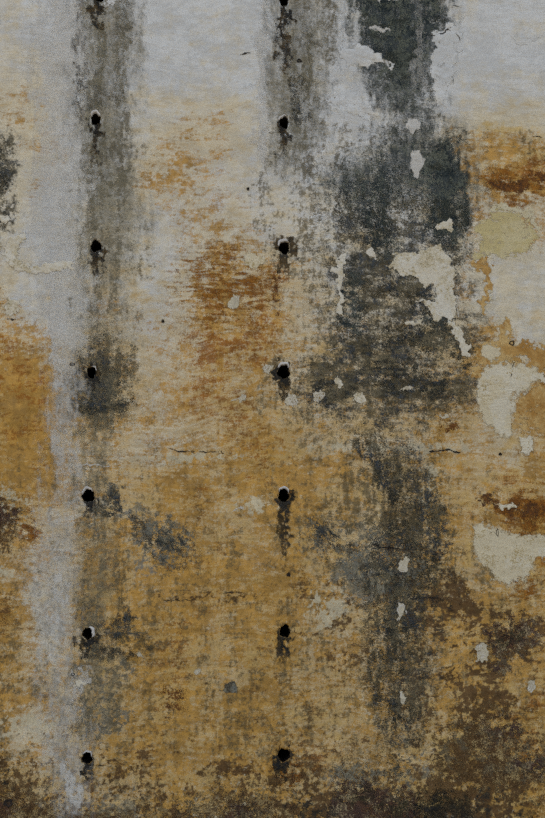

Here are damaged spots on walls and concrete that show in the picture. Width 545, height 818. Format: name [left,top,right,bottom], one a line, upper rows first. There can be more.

damp [252,0,334,163]
damp [0,133,20,231]
damp [29,0,145,462]
rust [176,244,285,324]
damp [271,0,545,438]
peeling [386,243,471,357]
peeling [435,218,453,233]
rust [479,165,545,207]
peeling [475,343,545,456]
damp [354,439,454,755]
peeling [473,521,545,585]
rust [476,490,545,536]